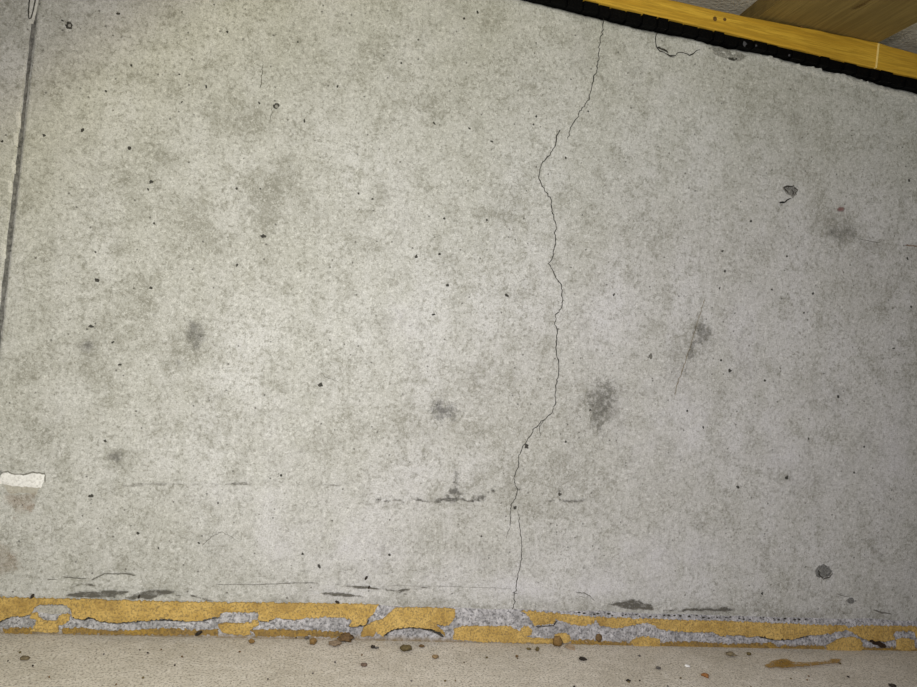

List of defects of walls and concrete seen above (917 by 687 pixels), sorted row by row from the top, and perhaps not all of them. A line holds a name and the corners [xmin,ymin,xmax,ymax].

crack [655,34,698,57]
crack [504,18,604,609]
peeling [0,471,46,495]
crack [217,579,313,587]
peeling [0,596,917,651]